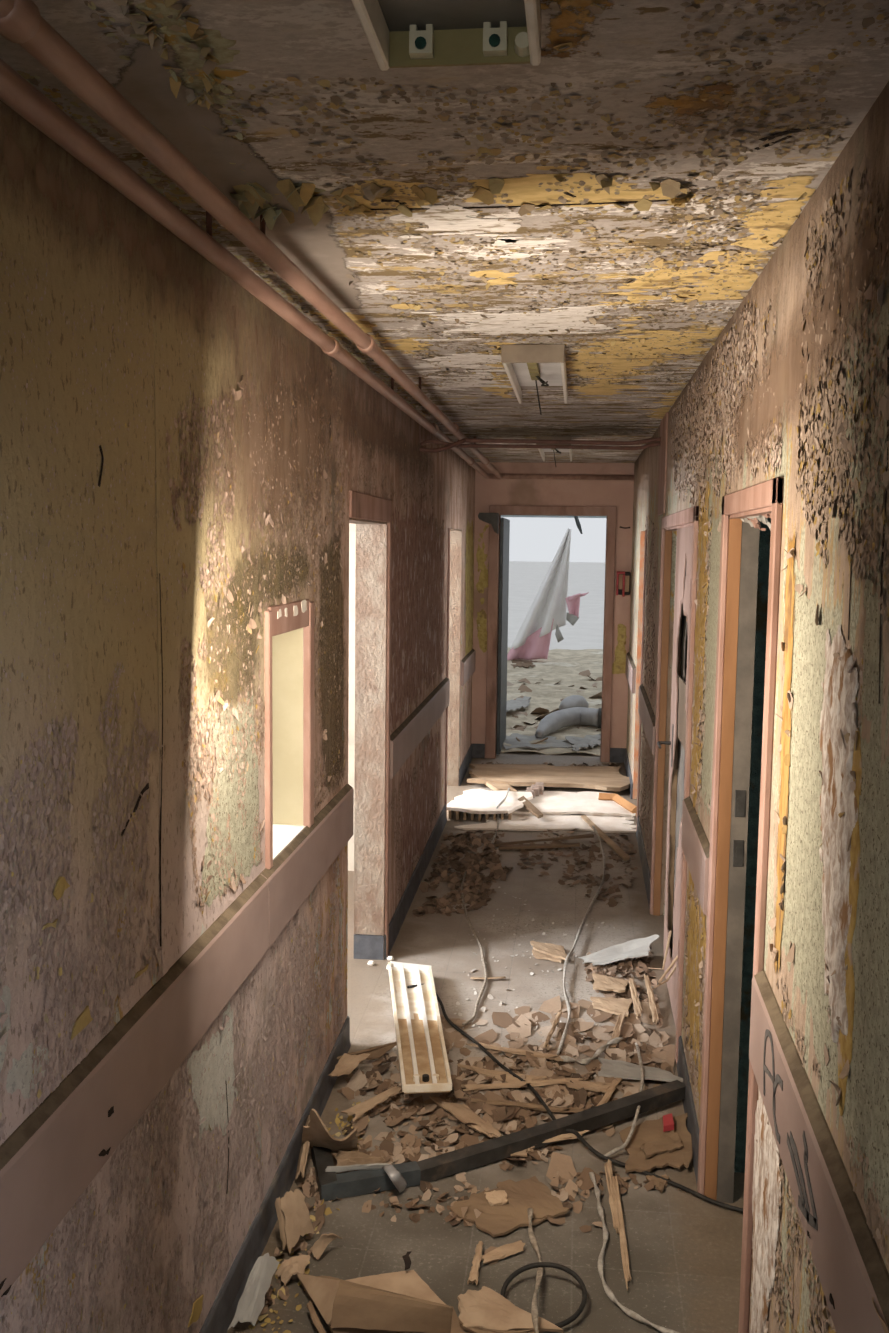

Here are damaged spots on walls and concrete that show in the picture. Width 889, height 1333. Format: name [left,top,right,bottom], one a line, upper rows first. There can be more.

peeling [16,70,442,431]
peeling [84,0,889,816]
peeling [166,359,445,917]
peeling [639,725,652,870]
peeling [682,868,706,1114]
peeling [248,1167,342,1333]
peeling [362,1171,489,1226]
peeling [326,1028,674,1174]
peeling [499,1143,687,1214]
peeling [768,1154,836,1333]